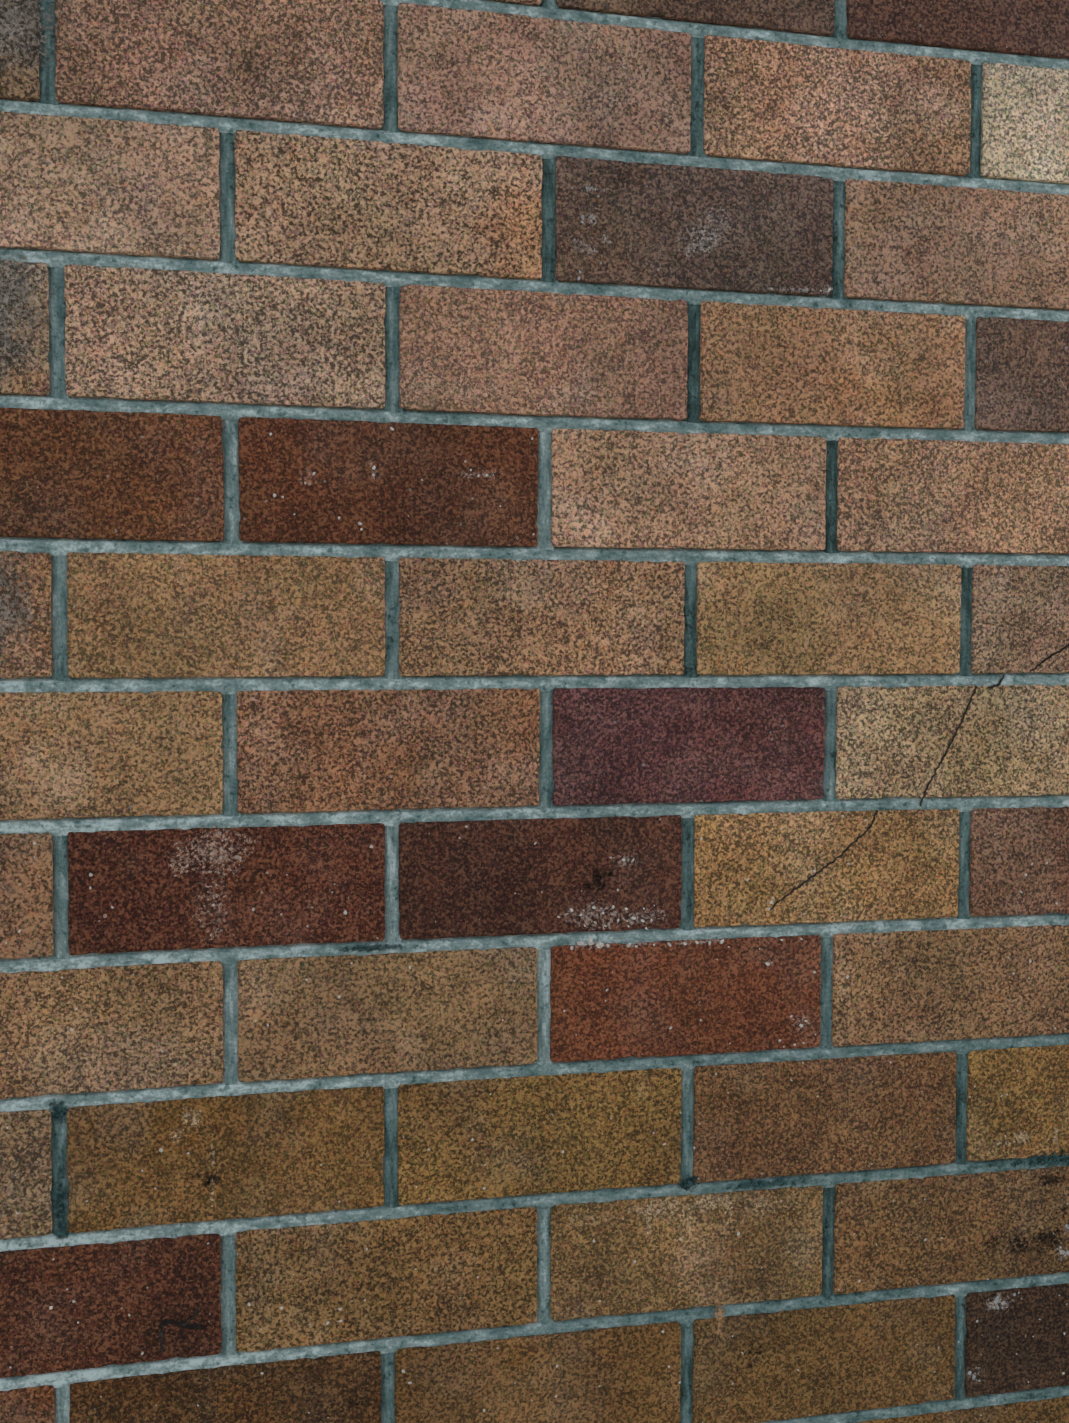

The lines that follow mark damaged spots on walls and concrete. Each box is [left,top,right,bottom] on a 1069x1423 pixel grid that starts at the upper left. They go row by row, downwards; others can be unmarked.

crack [920,644,1069,807]
crack [767,810,878,911]